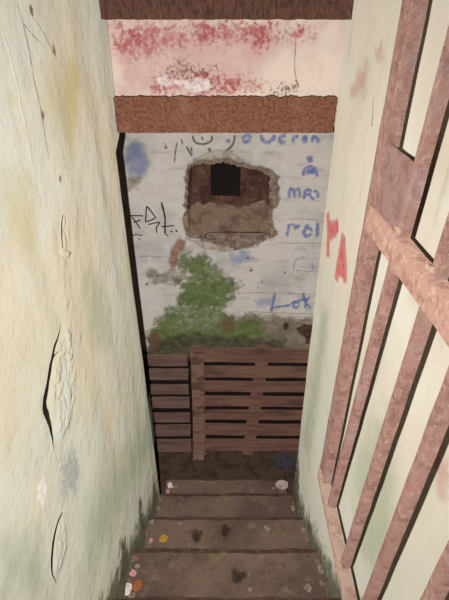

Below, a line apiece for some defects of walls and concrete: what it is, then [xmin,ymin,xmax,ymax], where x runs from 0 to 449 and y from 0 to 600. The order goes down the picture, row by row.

spalling [182,150,280,252]
crack [42,322,62,449]
crack [51,513,62,582]